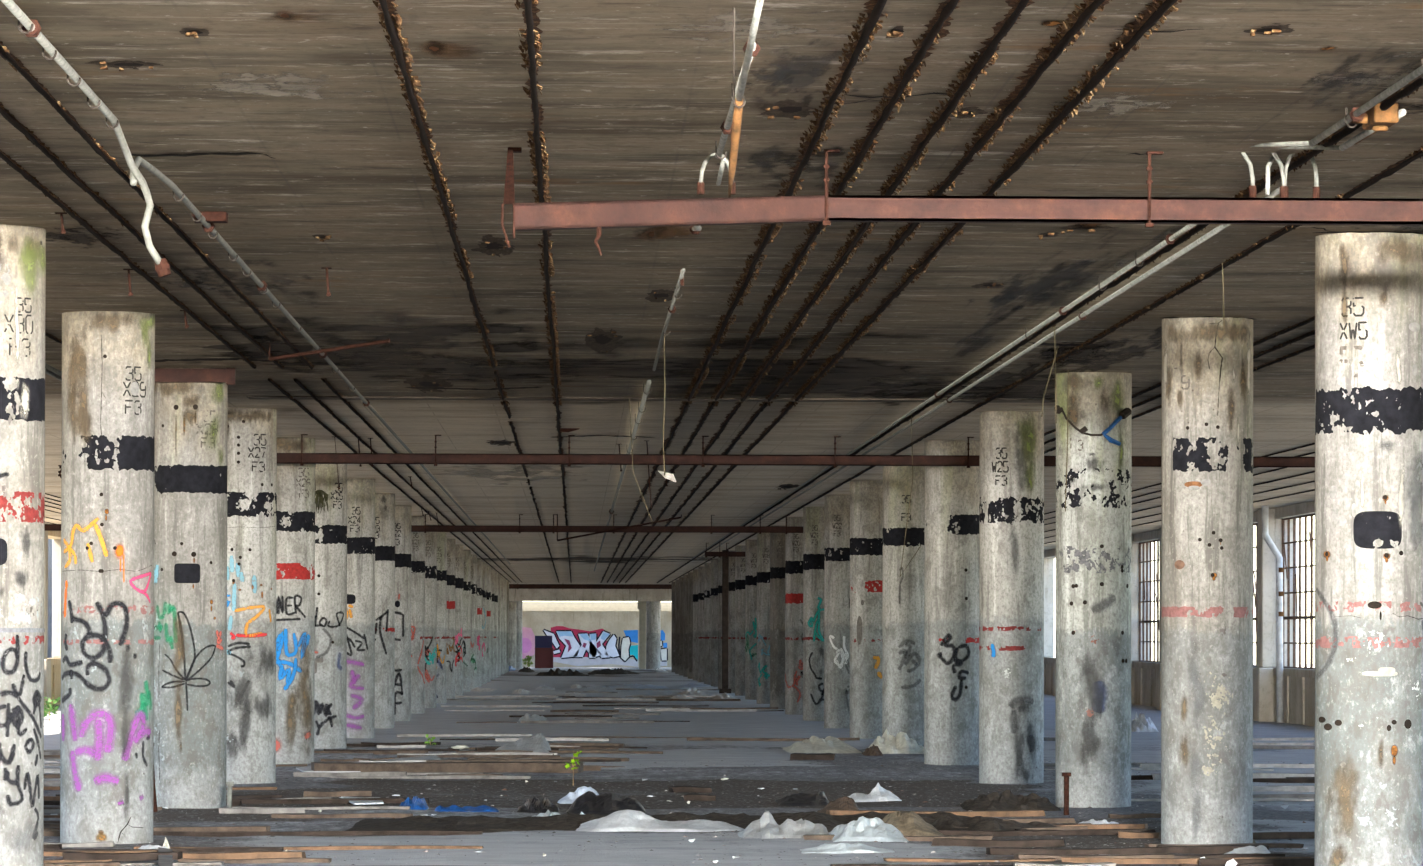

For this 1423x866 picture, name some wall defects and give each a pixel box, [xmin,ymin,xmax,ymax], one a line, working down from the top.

corrosion [372,0,457,221]
corrosion [518,29,543,95]
corrosion [798,13,888,155]
corrosion [880,51,998,196]
corrosion [982,0,1182,196]
leakage [0,227,118,271]
leakage [155,382,198,423]
leakage [211,411,271,463]
leakage [196,308,1268,441]
corrosion [681,222,963,407]
leakage [957,230,1172,356]
leakage [286,647,312,754]